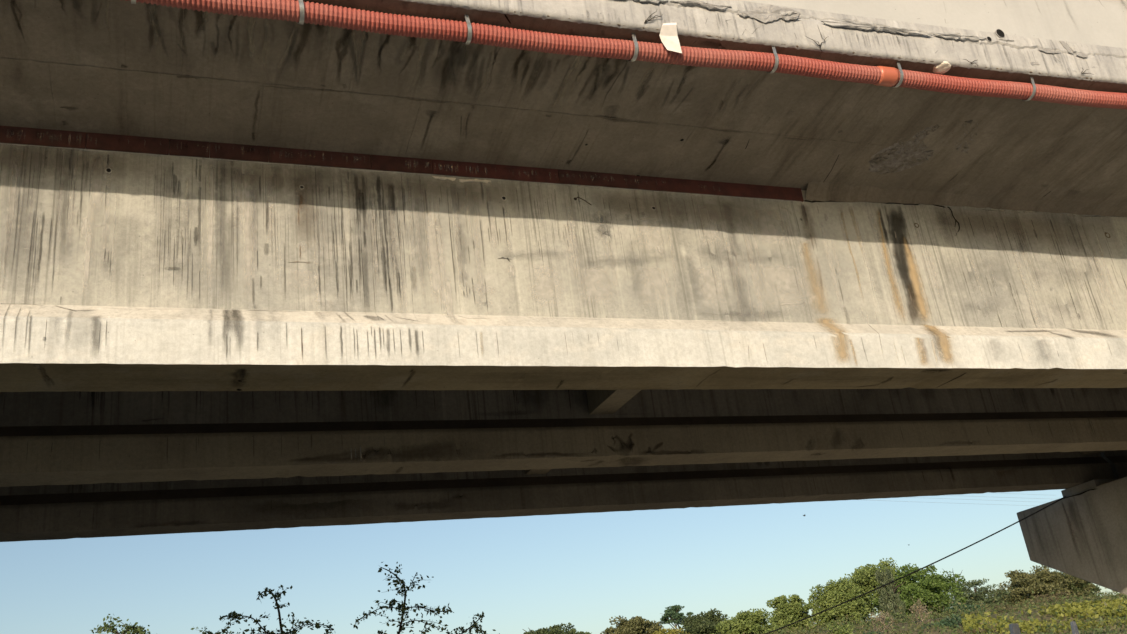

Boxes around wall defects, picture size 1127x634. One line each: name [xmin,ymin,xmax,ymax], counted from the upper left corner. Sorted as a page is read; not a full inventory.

damp [356,179,442,289]
corrosion [878,210,951,361]